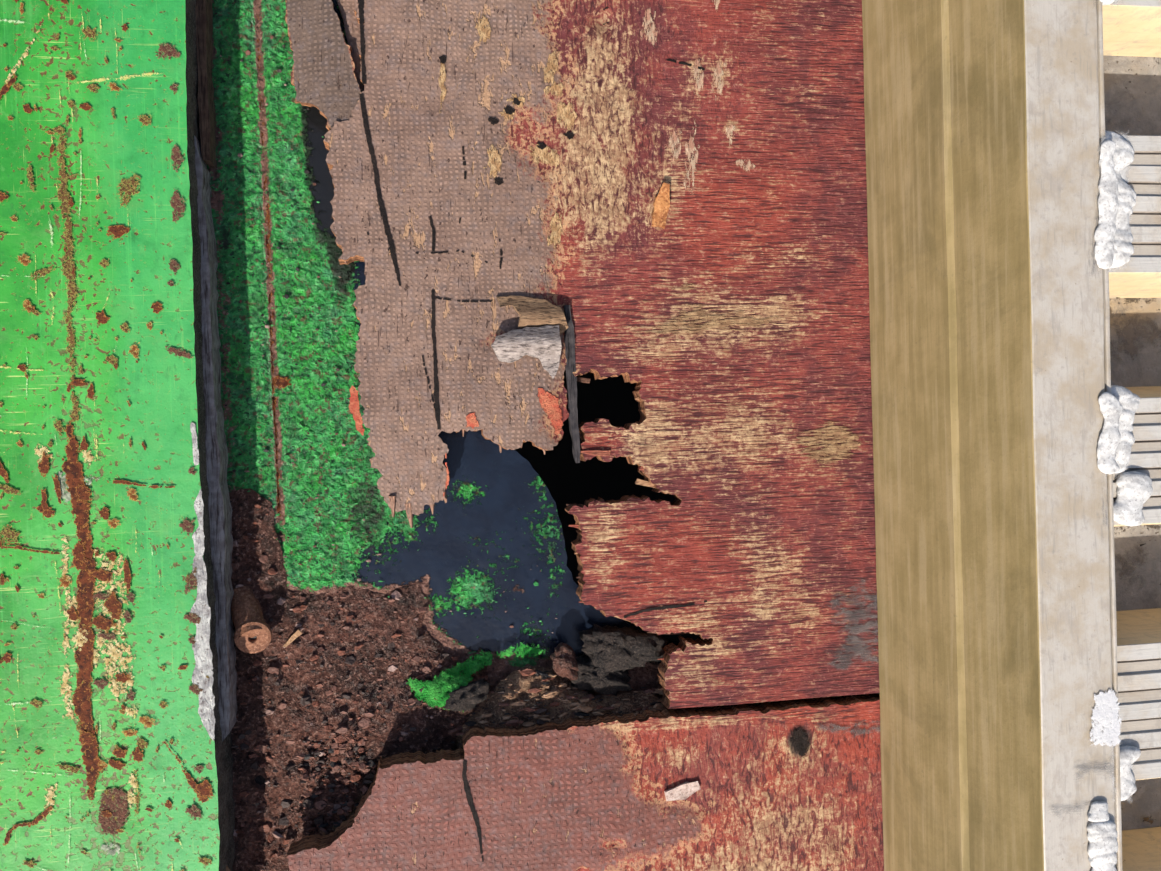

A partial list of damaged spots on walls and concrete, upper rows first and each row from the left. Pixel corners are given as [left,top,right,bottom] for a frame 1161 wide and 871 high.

peeling [640,6,658,45]
peeling [285,0,364,131]
peeling [669,119,700,195]
corrosion [170,188,186,223]
corrosion [146,302,194,359]
corrosion [0,82,175,856]
peeling [348,386,365,435]
spalling [491,296,675,585]
corrosion [183,612,202,644]
peeling [406,642,664,745]
corrosion [186,765,213,821]
crack [462,761,484,862]